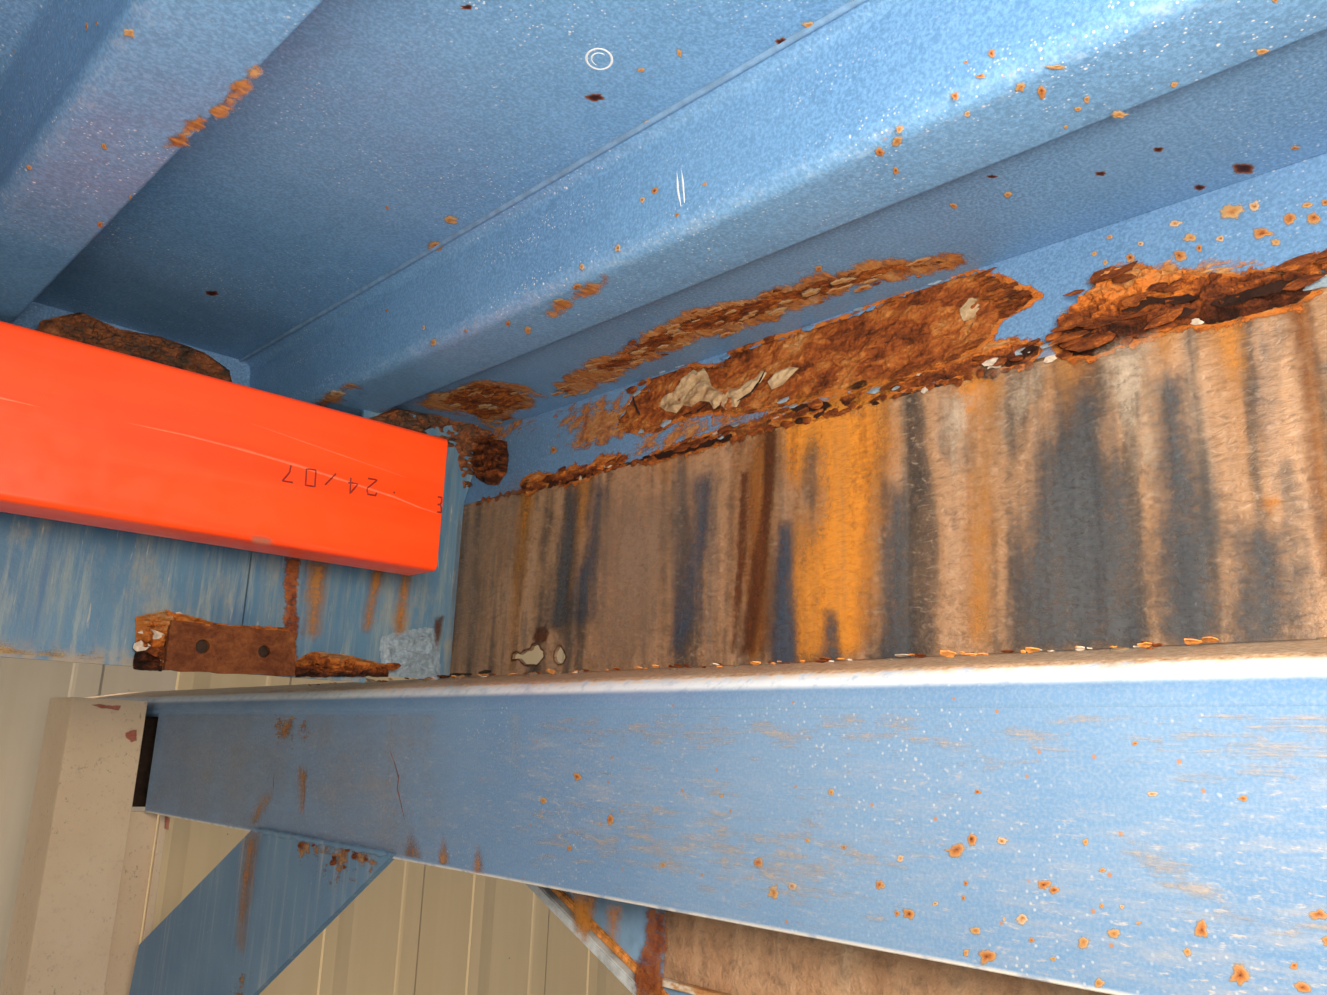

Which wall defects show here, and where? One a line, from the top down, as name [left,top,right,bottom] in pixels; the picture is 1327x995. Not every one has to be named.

rust [164,66,262,147]
rust [1015,82,1047,99]
rust [875,125,904,157]
rust [1220,200,1260,219]
rust [1253,199,1327,246]
peeling [1303,270,1327,291]
spalling [611,267,1052,435]
rust [945,833,977,858]
rust [550,888,669,995]
rust [963,949,996,965]
rust [1183,919,1208,957]
rust [1290,963,1311,993]